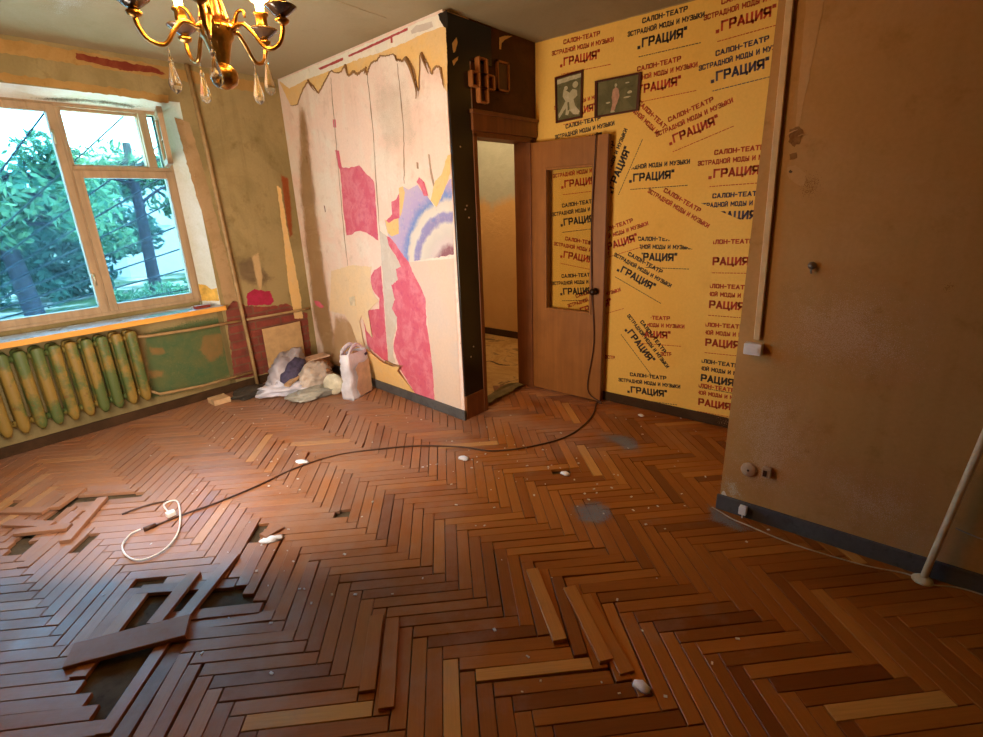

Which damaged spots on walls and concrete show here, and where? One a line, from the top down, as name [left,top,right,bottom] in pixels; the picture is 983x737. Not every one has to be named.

flaking render [379,231,401,363]